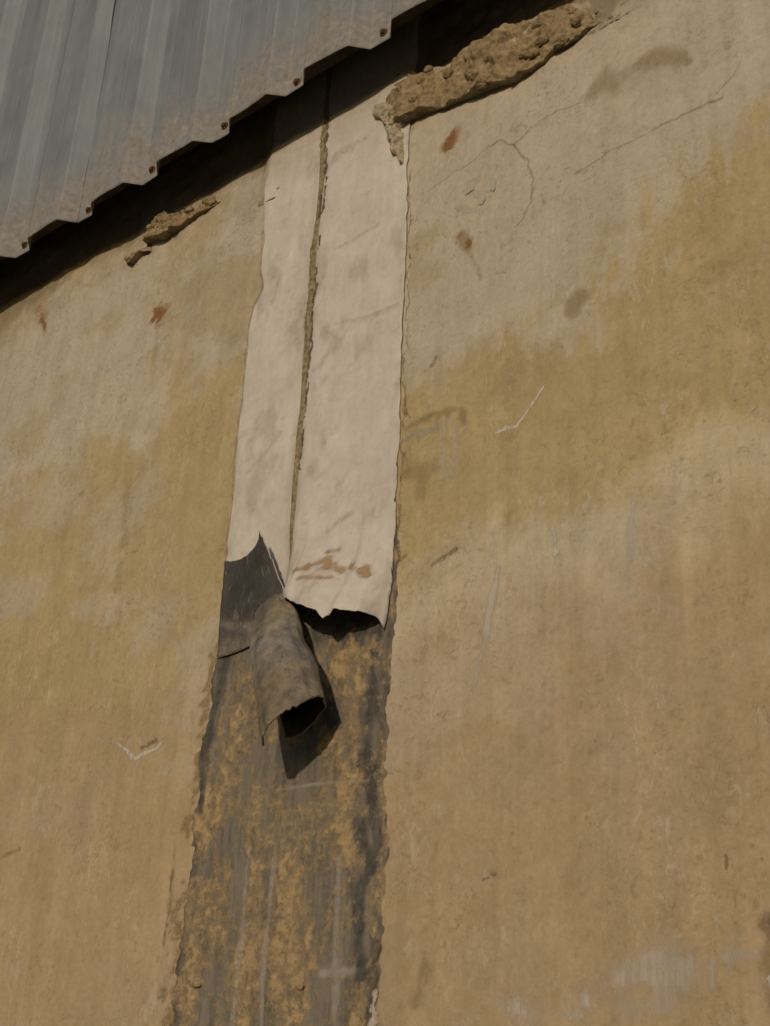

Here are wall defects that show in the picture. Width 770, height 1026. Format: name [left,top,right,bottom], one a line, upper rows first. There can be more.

rust [443,130,458,152]
spalling [124,196,220,264]
peeling [159,0,646,1026]
rust [291,550,371,578]